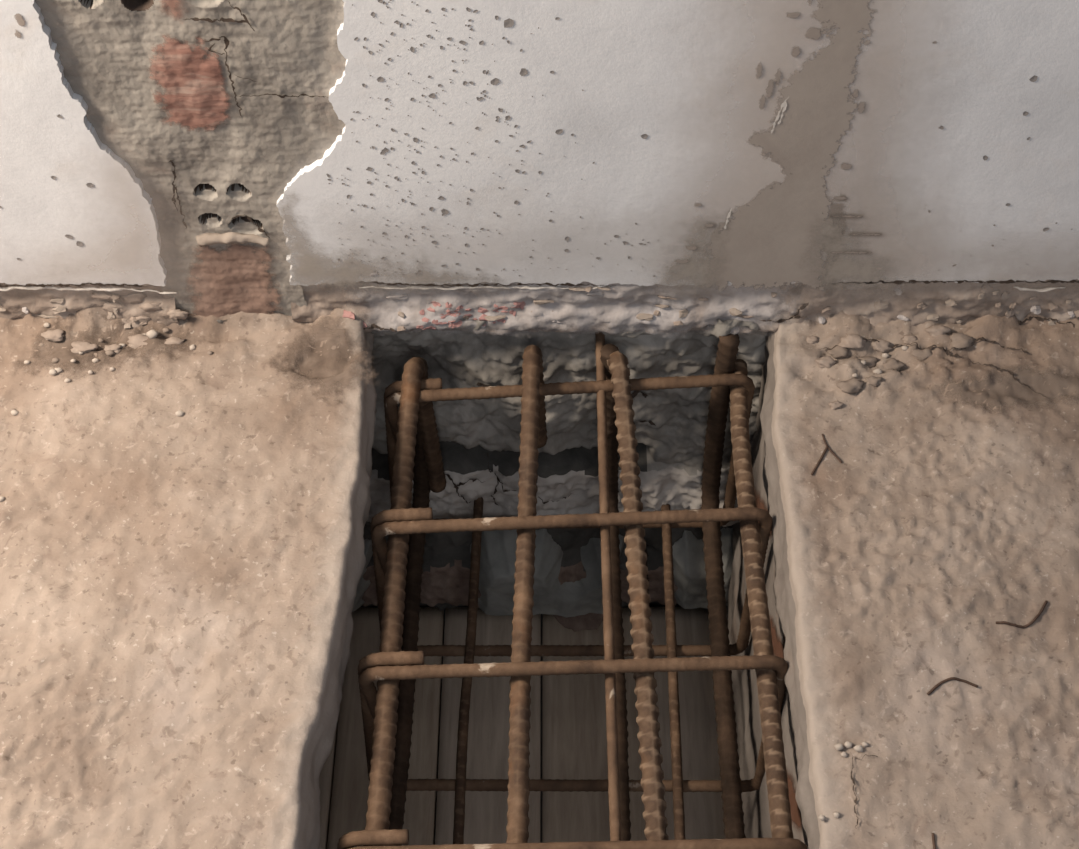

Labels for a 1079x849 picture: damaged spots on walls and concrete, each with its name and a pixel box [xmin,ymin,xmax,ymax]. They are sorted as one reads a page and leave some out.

flaking render [354,1,542,174]
flaking render [366,128,429,207]
flaking render [421,181,501,274]
crack [837,279,1079,397]
corrosion [770,618,786,659]
corrosion [787,774,802,829]